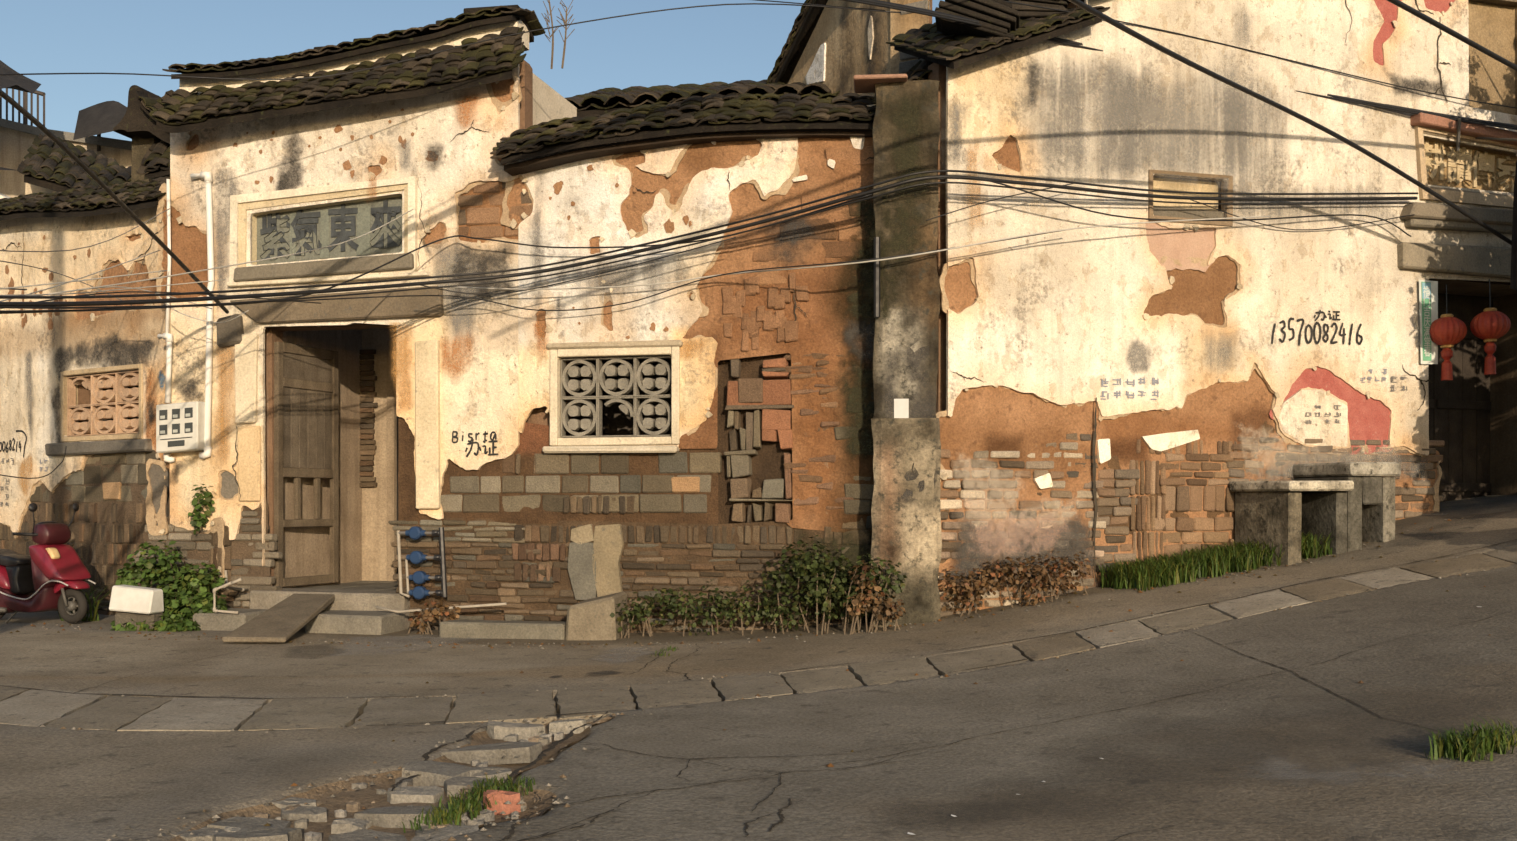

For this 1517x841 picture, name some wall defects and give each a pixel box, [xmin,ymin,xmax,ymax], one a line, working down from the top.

peeling [1373,0,1402,66]
peeling [1424,0,1455,16]
water stain [881,95,928,295]
flaking render [992,136,1021,172]
water stain [1028,65,1364,217]
flaking render [1142,223,1243,328]
flaking render [388,129,876,633]
water stain [885,344,934,418]
flaking render [936,362,1445,617]
crack [391,720,504,791]
crack [484,610,1515,841]